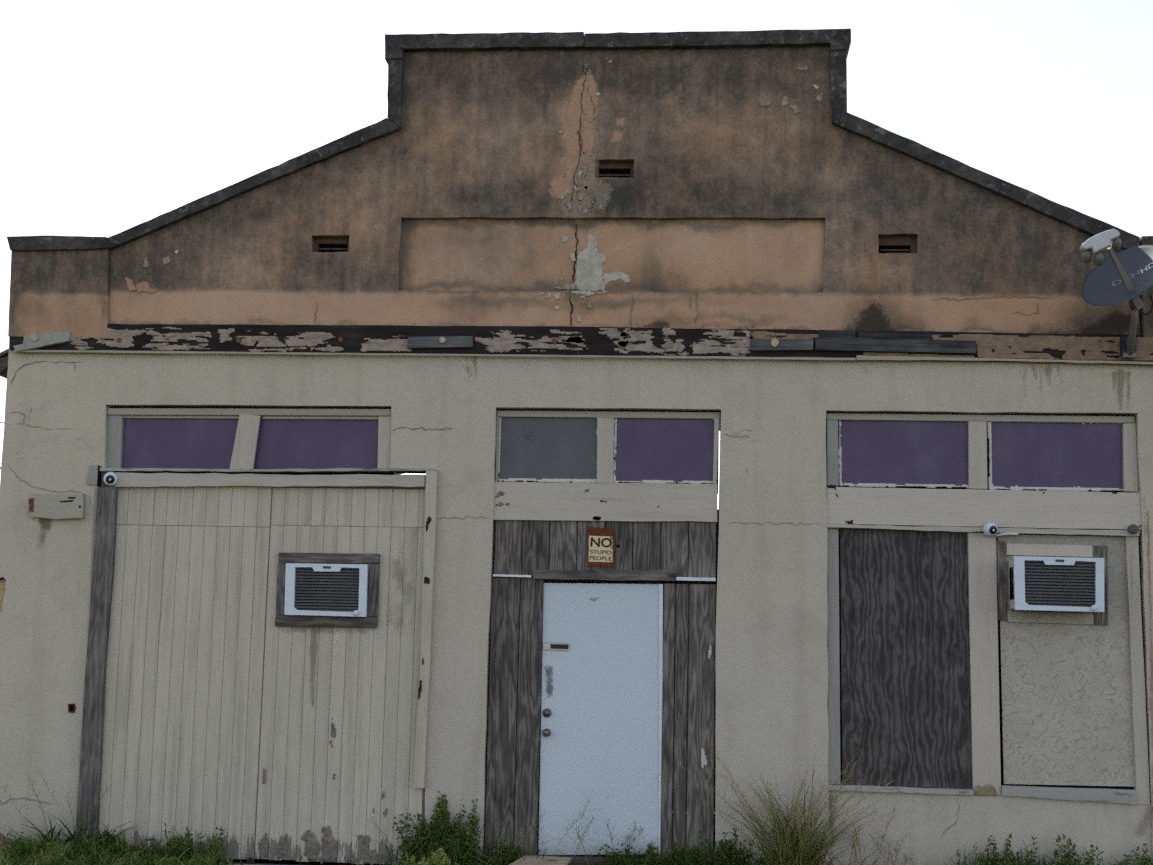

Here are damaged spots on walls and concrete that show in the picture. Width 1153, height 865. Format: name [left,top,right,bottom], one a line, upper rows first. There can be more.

peeling [549,70,614,213]
crack [569,54,595,326]
peeling [125,250,178,294]
peeling [475,235,631,354]
damp [848,306,894,331]
peeling [70,327,344,352]
peeling [360,335,412,352]
peeling [598,327,819,356]
peeling [863,334,1153,361]
crack [11,361,75,384]
peeling [260,825,403,865]